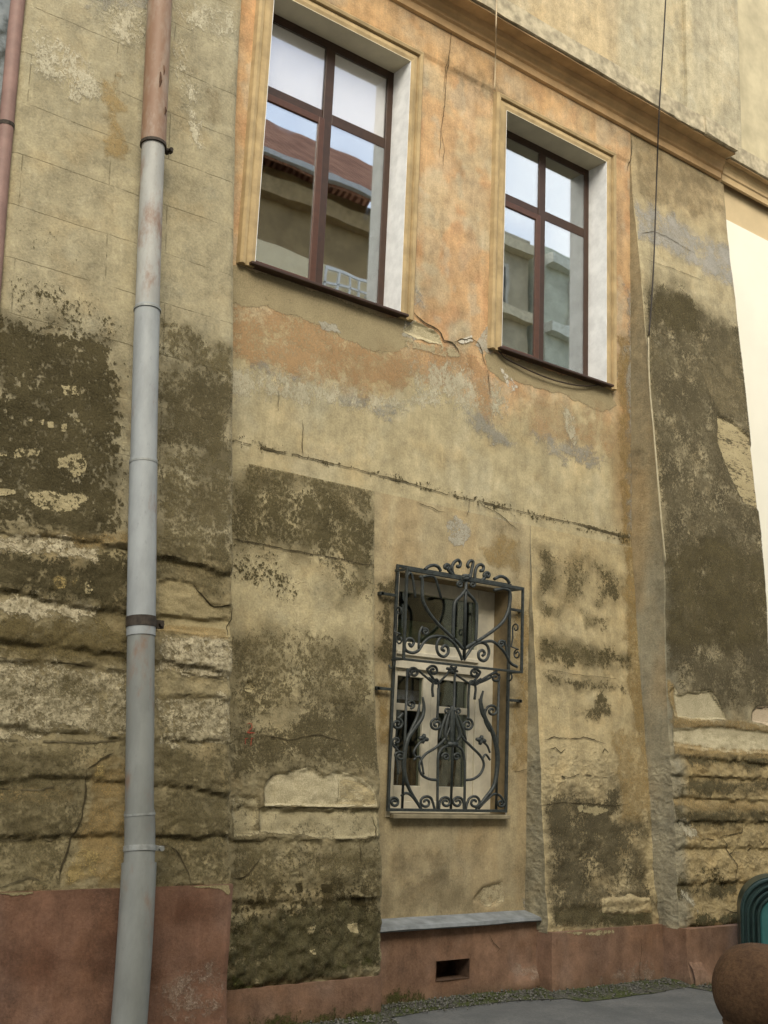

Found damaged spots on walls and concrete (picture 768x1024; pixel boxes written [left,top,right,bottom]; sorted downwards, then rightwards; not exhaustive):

crack [439,38,451,169]
crack [414,313,490,390]
leakage [0,278,129,667]
crack [236,422,630,538]
leakage [643,282,768,712]
flaking render [717,417,757,508]
flaking render [0,655,127,743]
flaking render [156,578,232,679]
leakage [155,317,395,955]
flaking render [667,680,768,758]
crack [59,753,113,881]
leakage [545,787,657,929]